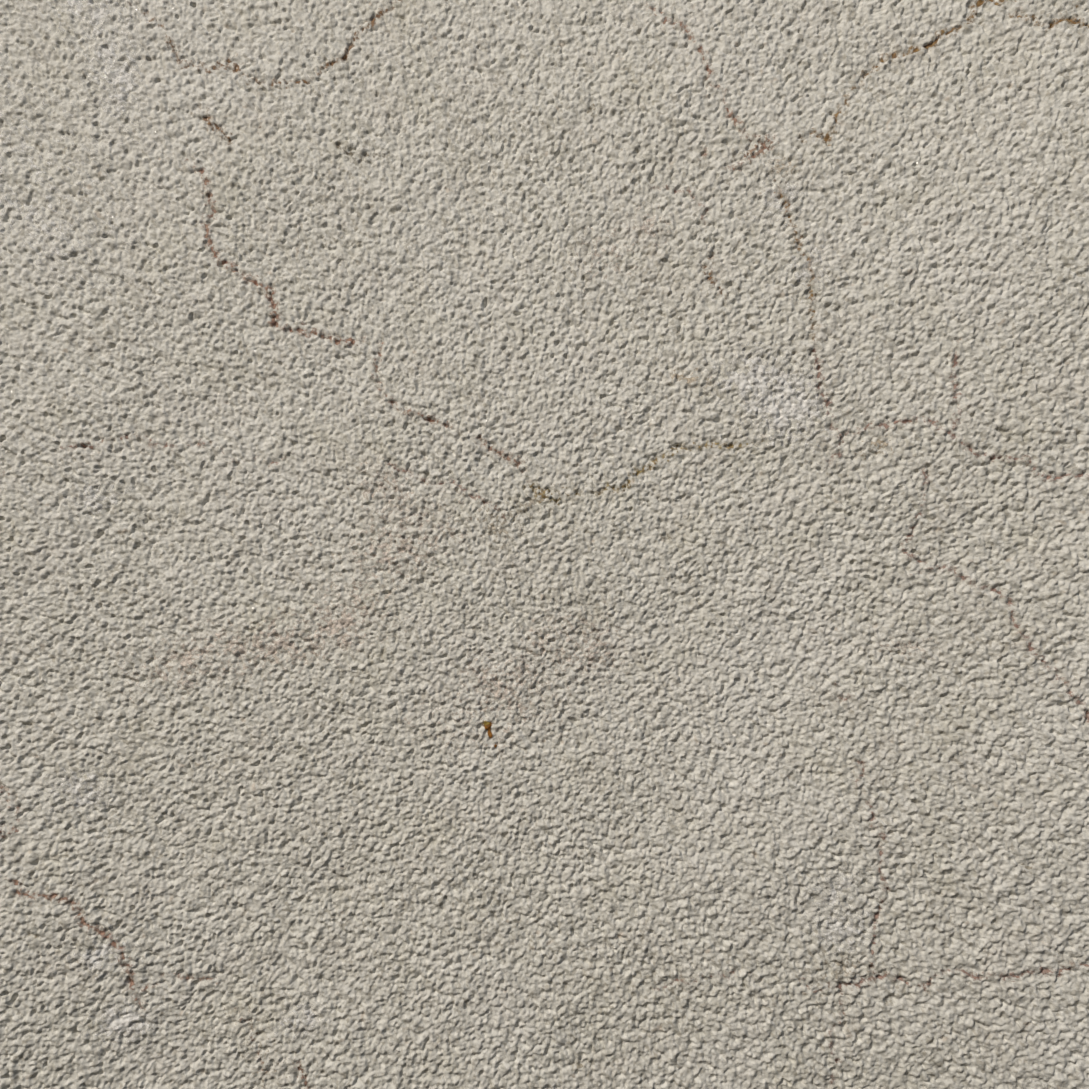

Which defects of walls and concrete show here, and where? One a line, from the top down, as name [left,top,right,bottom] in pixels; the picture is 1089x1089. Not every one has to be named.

crack [203,116,232,142]
crack [144,7,394,88]
crack [651,8,772,170]
crack [799,0,1088,146]
crack [186,159,448,427]
crack [774,183,1083,480]
crack [389,463,505,519]
crack [479,435,763,505]
crack [902,470,1089,722]
rust [433,610,626,759]
crack [13,880,213,1000]
crack [806,806,1089,1084]